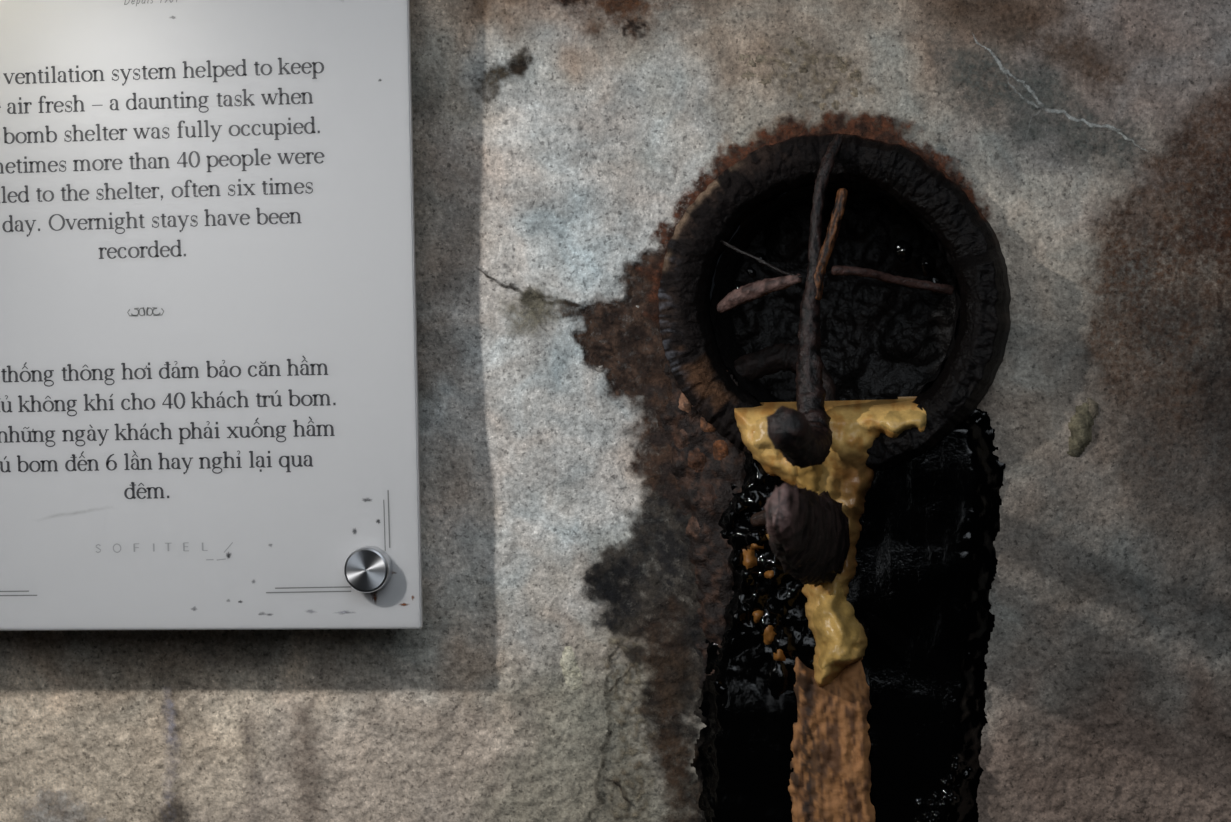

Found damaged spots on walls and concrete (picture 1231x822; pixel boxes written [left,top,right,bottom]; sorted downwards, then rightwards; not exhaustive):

crack [975,39,1146,151]
crack [479,269,580,307]
rust [636,110,990,325]
damp [950,0,1231,418]
rust [658,361,746,689]